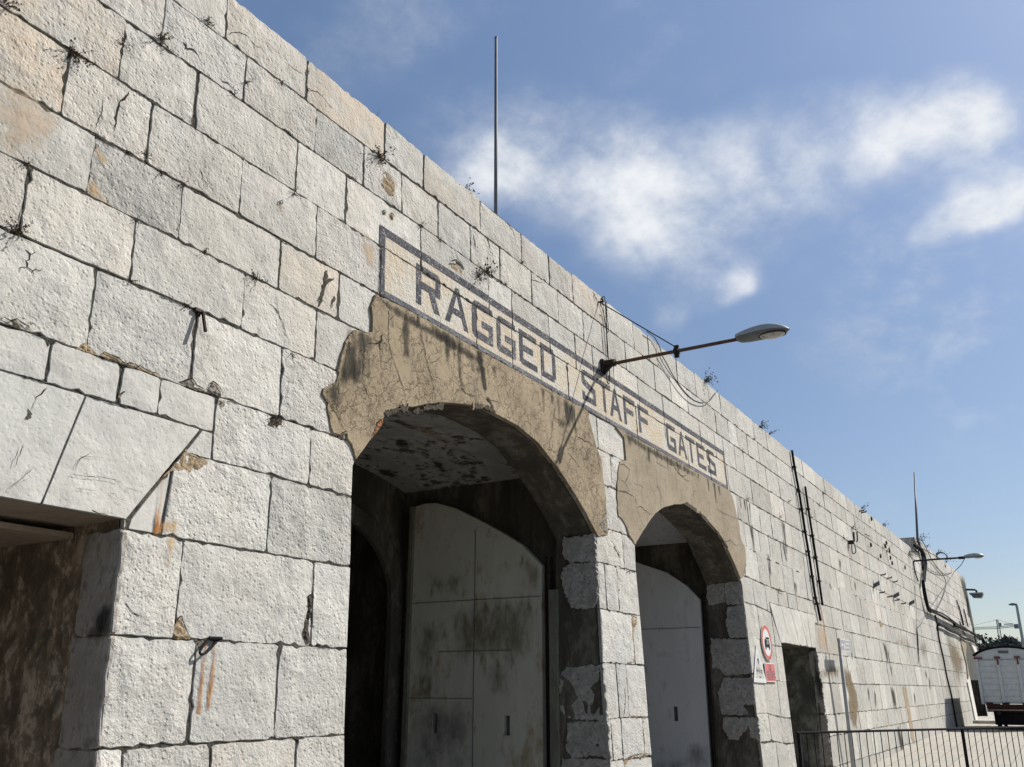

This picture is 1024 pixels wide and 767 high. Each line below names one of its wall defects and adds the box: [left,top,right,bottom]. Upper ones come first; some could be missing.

crack [94,92,129,131]
crack [19,250,43,277]
crack [318,270,336,308]
crack [326,303,500,428]
leakage [387,303,495,390]
spalling [374,402,445,436]
spalling [164,449,209,477]
corrosion [154,507,176,548]
corrosion [197,644,215,713]